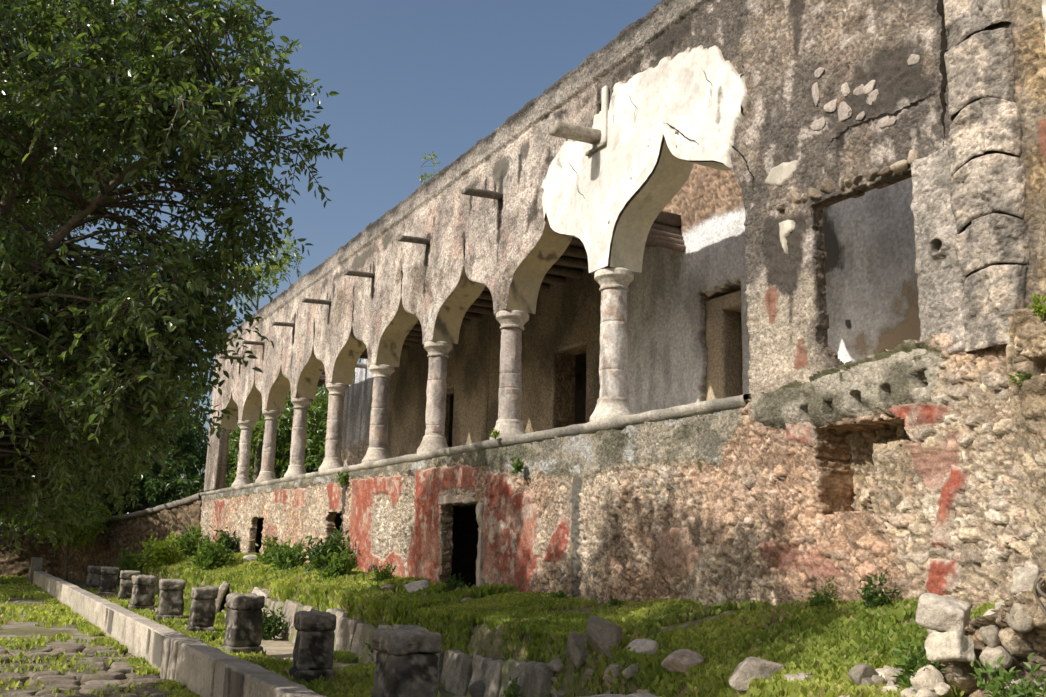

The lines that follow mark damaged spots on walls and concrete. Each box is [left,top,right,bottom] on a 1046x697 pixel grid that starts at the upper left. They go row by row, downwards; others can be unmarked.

spalling [812,67,879,131]
spalling [878,115,896,128]
crack [827,0,948,146]
spalling [907,54,920,66]
peeling [327,463,572,593]